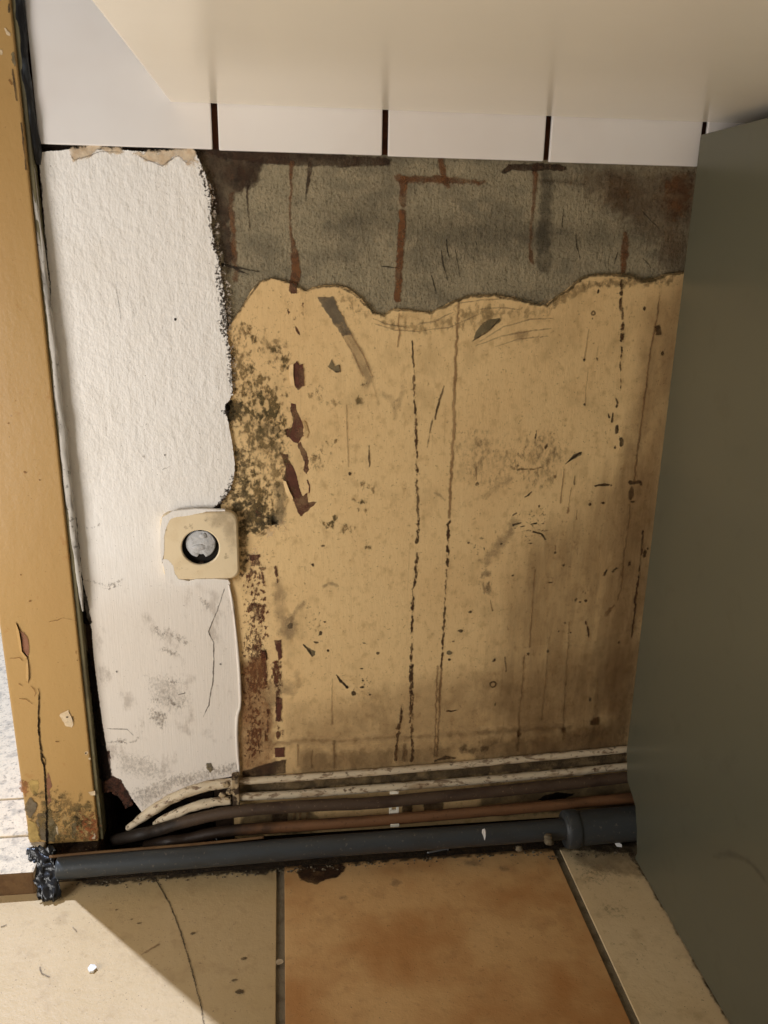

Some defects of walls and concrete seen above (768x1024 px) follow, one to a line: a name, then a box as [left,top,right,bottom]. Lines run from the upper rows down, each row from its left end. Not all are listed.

leakage [195,150,263,281]
corrosion [195,149,485,302]
spalling [136,149,697,394]
corrosion [501,163,566,264]
leakage [225,322,291,575]
peeling [279,403,316,516]
peeling [16,624,35,704]
crack [205,591,224,712]
corrosion [240,554,286,777]
crack [37,689,48,844]